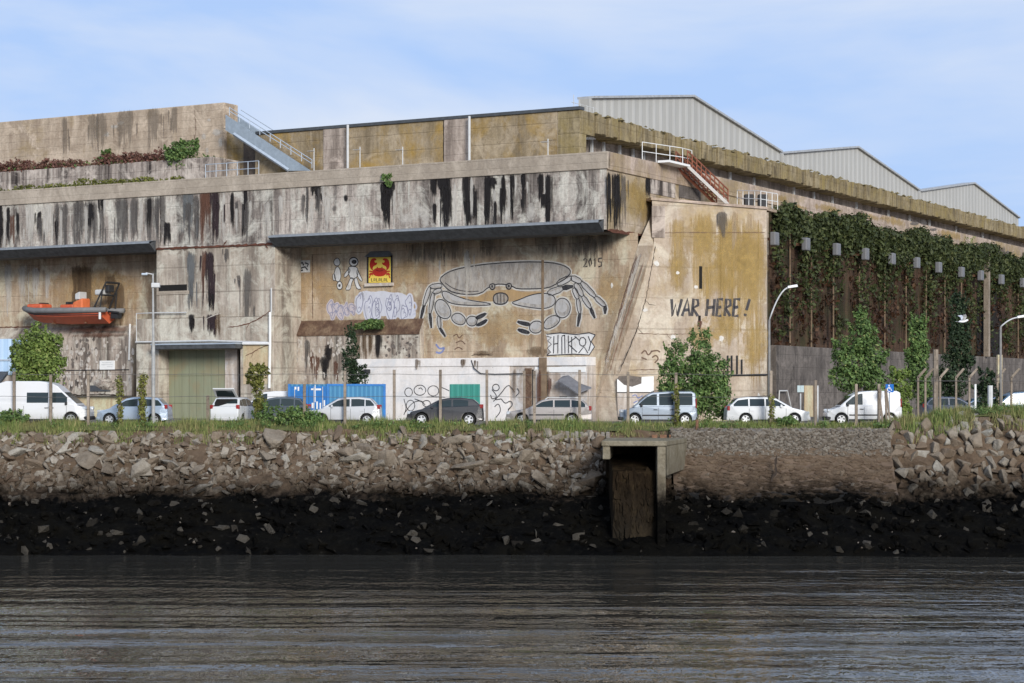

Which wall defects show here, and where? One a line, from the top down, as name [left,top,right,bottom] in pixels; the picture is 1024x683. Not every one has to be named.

damp [88,108,177,145]
damp [0,197,171,247]
corrosion [200,193,211,295]
damp [183,191,283,336]
damp [380,174,553,227]
damp [574,172,629,265]
damp [672,212,764,374]
damp [305,341,332,379]